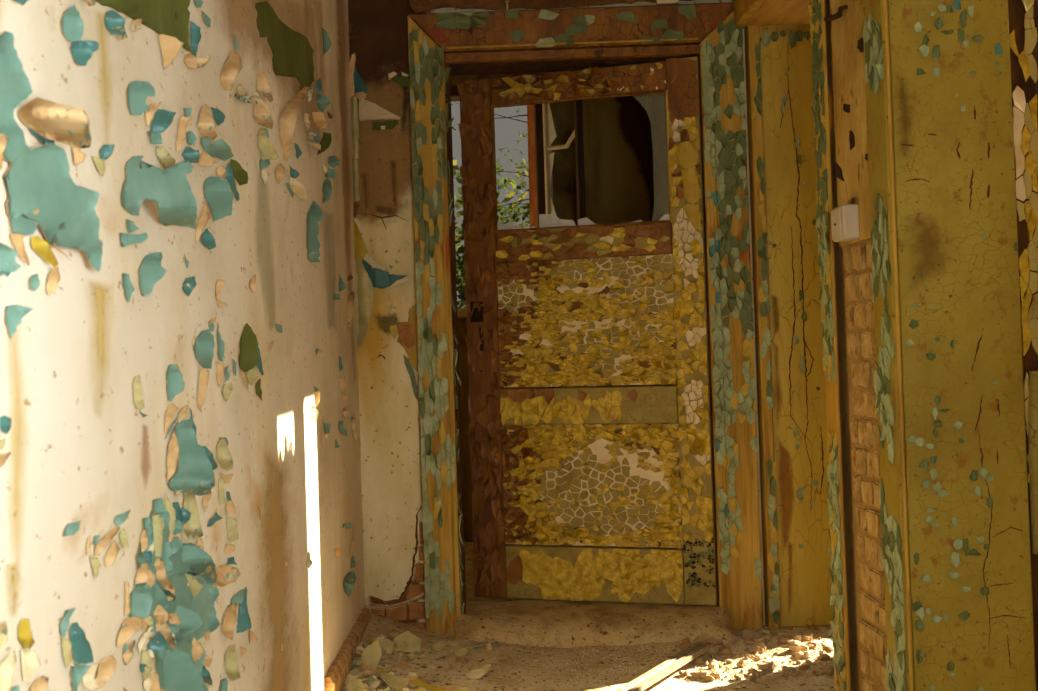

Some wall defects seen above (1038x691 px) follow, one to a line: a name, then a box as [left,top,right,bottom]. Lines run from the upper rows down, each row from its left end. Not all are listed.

peeling [5,305,32,339]
peeling [0,618,49,691]
peeling [0,31,115,296]
peeling [60,0,211,70]
peeling [59,280,282,691]
crack [398,506,422,600]
peeling [119,0,847,691]
crack [780,43,824,511]
flaking render [844,193,970,691]
crack [902,134,990,210]
crack [975,397,1024,668]
peeling [995,0,1038,356]